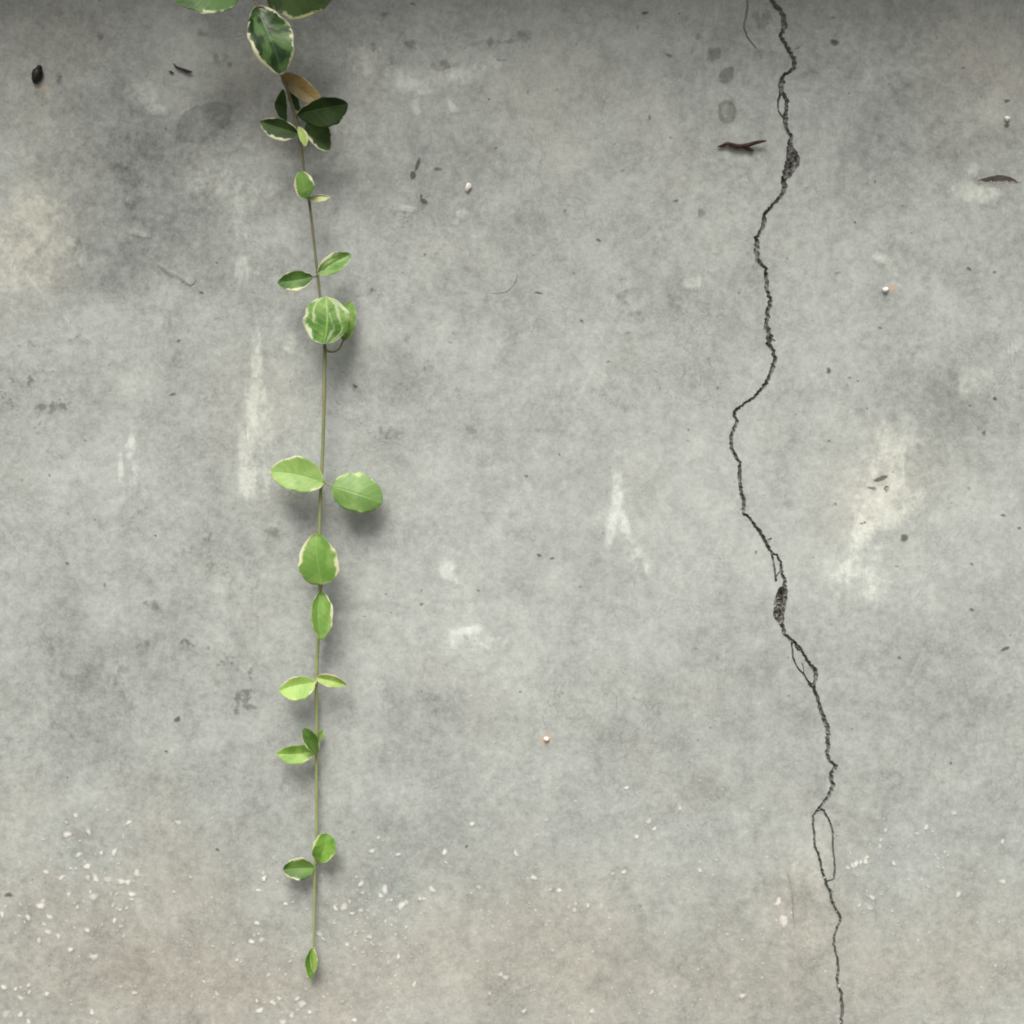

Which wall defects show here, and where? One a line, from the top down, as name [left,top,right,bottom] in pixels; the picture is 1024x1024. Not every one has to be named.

crack [729,0,844,1024]